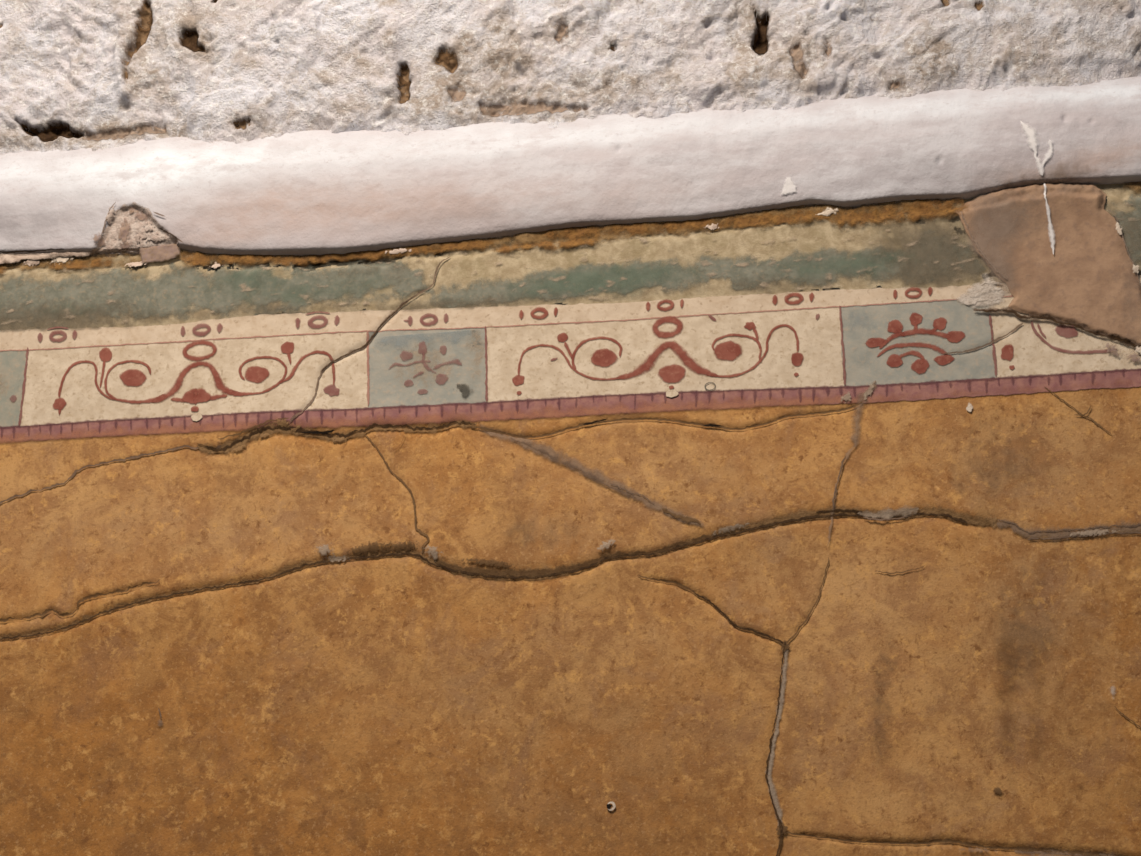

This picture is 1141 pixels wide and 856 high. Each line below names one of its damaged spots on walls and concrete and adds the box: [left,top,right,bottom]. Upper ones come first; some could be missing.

spalling [0,202,182,264]
peeling [958,277,1005,308]
crack [0,256,1141,856]